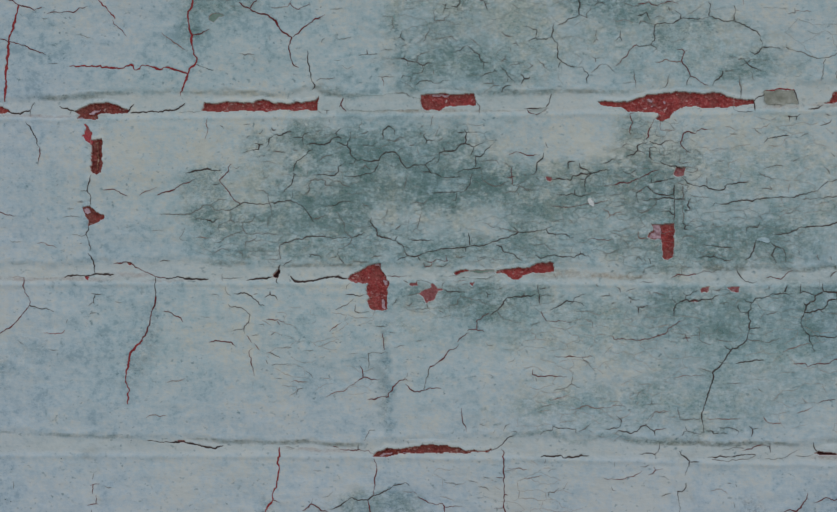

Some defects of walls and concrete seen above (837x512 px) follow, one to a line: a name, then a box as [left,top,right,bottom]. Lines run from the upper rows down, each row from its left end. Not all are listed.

crack [1,0,223,161]
peeling [203,99,319,112]
peeling [345,93,476,111]
peeling [600,92,754,121]
peeling [77,103,129,175]
crack [1,276,68,351]
crack [65,208,208,404]
peeling [348,264,389,311]
peeling [455,262,554,279]
peeling [374,445,492,457]
crack [262,447,291,512]
crack [784,494,837,512]